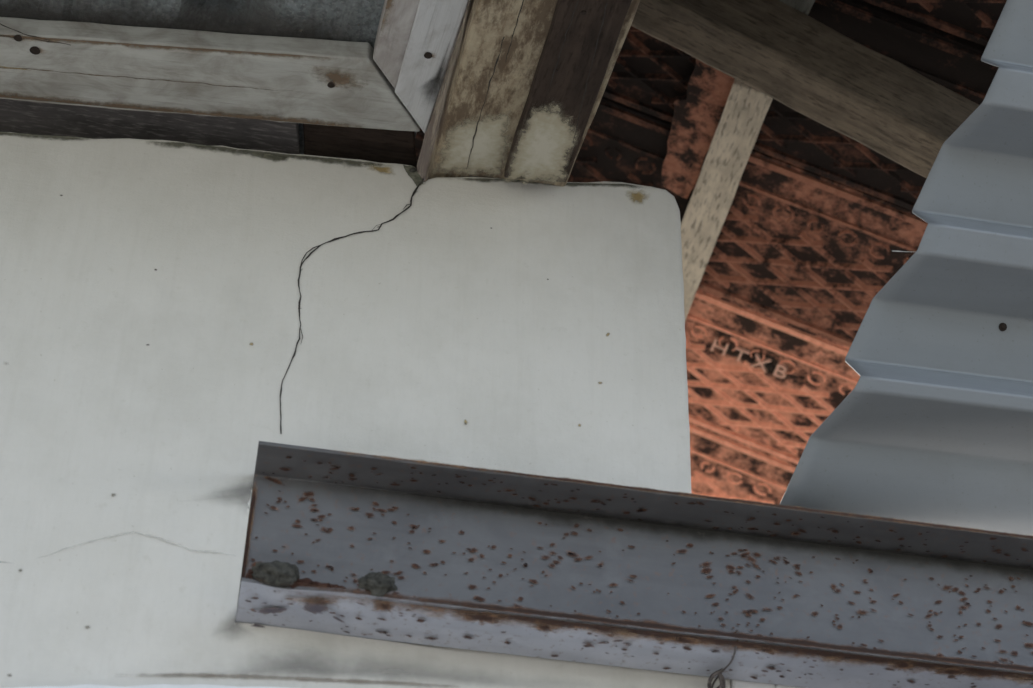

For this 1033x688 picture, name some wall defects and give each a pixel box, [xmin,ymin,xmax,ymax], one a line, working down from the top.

crack [280,179,424,434]
corrosion [240,456,333,584]
corrosion [371,456,1033,567]
corrosion [273,502,1033,688]
corrosion [162,674,430,685]